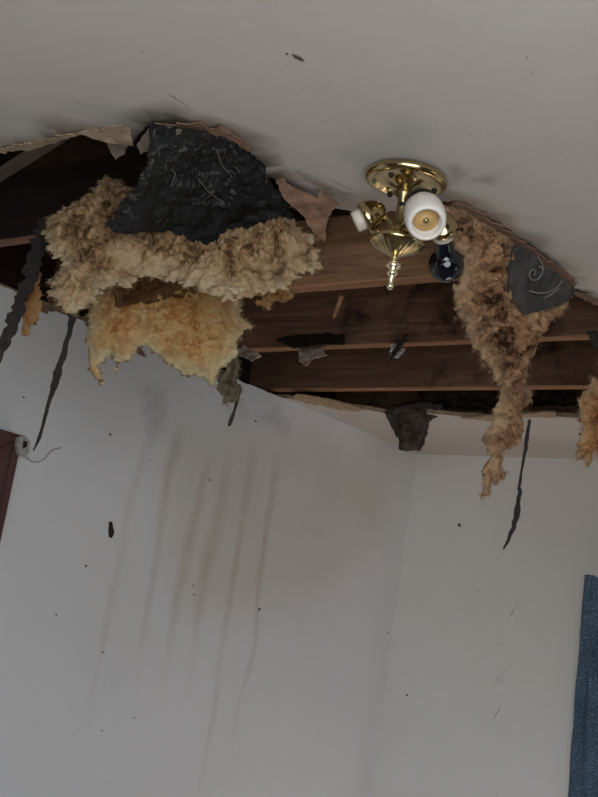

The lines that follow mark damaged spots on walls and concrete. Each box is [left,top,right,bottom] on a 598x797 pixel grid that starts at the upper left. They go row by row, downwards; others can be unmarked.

spalling [0,133,79,154]
spalling [155,122,252,152]
spalling [452,202,598,306]